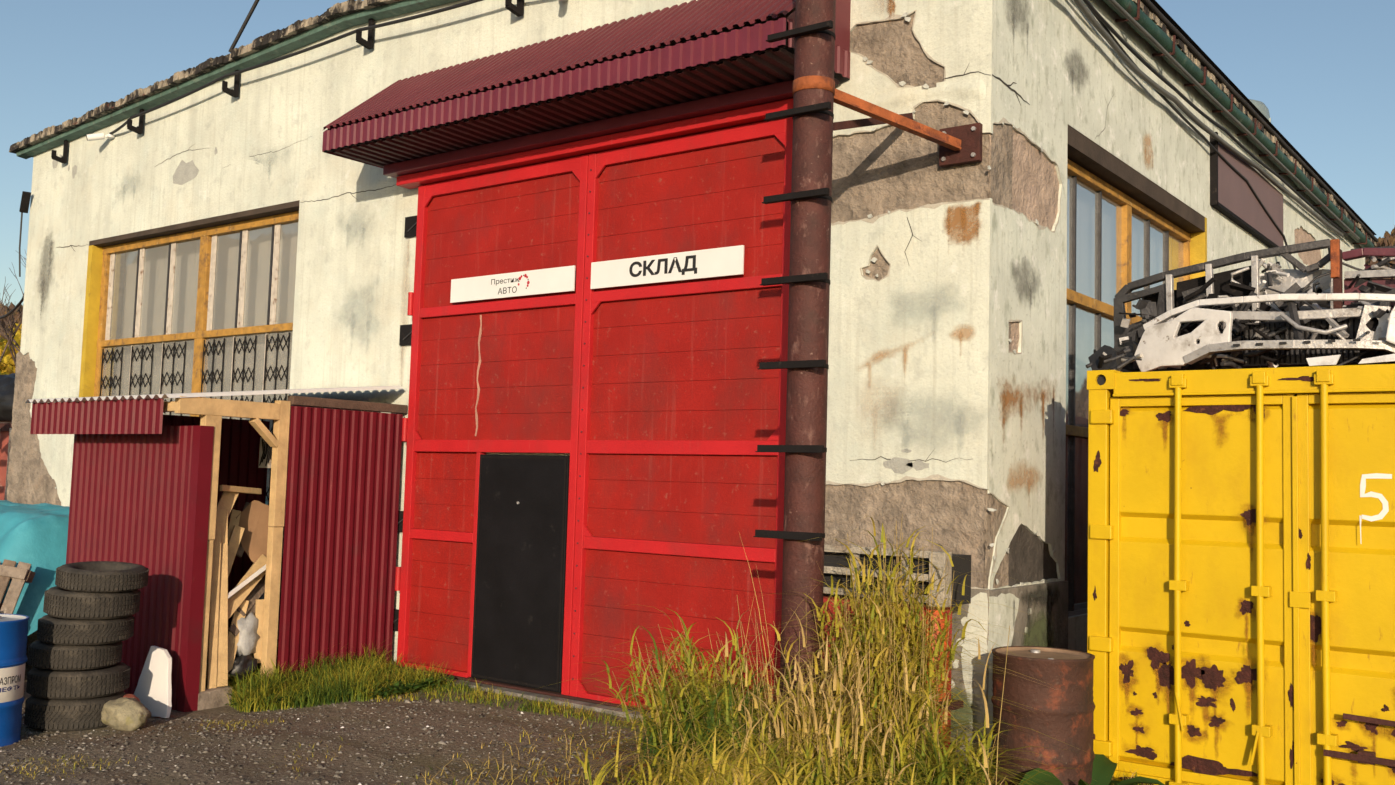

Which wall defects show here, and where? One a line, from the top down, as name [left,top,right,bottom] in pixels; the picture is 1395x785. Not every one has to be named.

flaking render [831,10,1063,233]
crack [944,69,1030,105]
flaking render [860,245,891,282]
corrosion [1240,507,1256,550]
flaking render [824,449,1058,753]
corrosion [1119,600,1258,777]
corrosion [1320,704,1395,785]